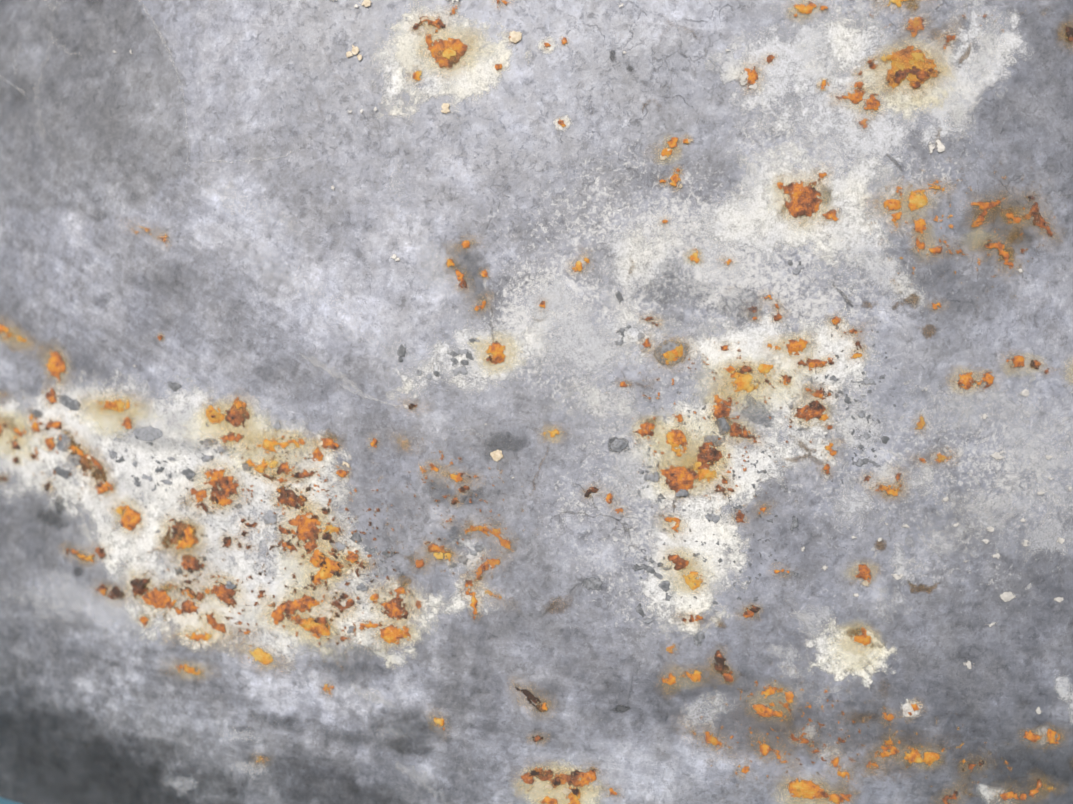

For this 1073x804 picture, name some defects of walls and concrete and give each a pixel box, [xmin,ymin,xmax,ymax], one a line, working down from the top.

corrosion [412,5,471,70]
corrosion [817,0,940,128]
corrosion [777,172,838,221]
corrosion [0,413,114,494]
corrosion [636,414,734,497]
water stain [40,501,63,527]
corrosion [162,518,204,574]
corrosion [246,435,365,639]
water stain [422,450,500,548]
corrosion [96,575,236,642]
corrosion [359,587,421,644]
corrosion [520,767,597,804]